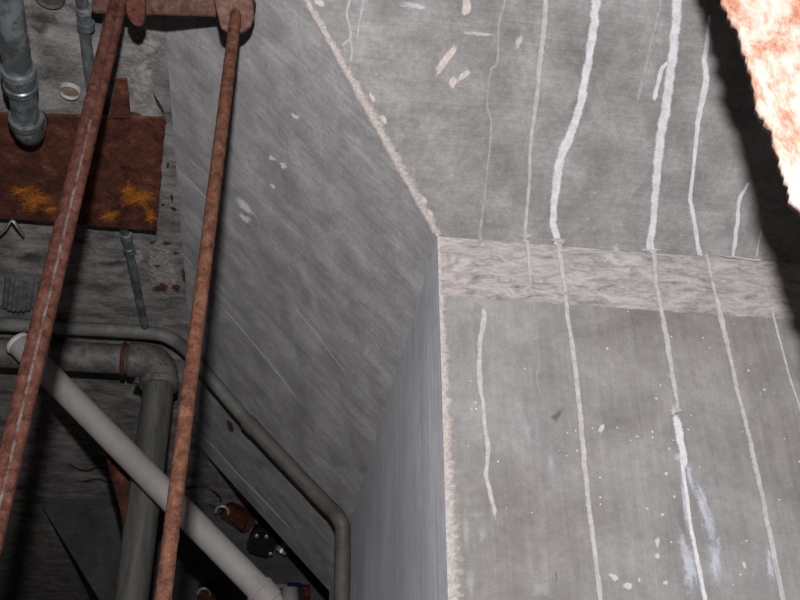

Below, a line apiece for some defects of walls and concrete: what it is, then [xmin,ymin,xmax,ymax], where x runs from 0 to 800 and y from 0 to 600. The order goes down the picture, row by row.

leakage [641,0,722,600]
leakage [688,15,786,600]
crack [718,213,764,261]